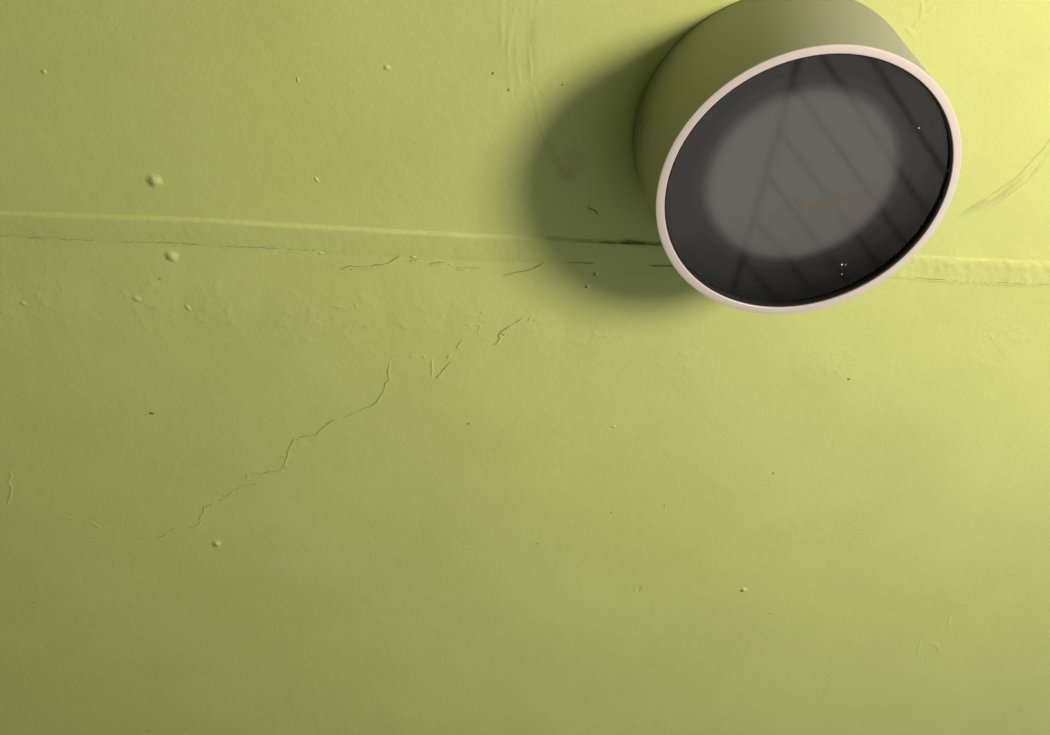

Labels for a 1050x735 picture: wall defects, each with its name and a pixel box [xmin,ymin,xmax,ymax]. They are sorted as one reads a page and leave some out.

crack [340,235,675,278]
crack [492,317,536,347]
crack [137,355,399,541]